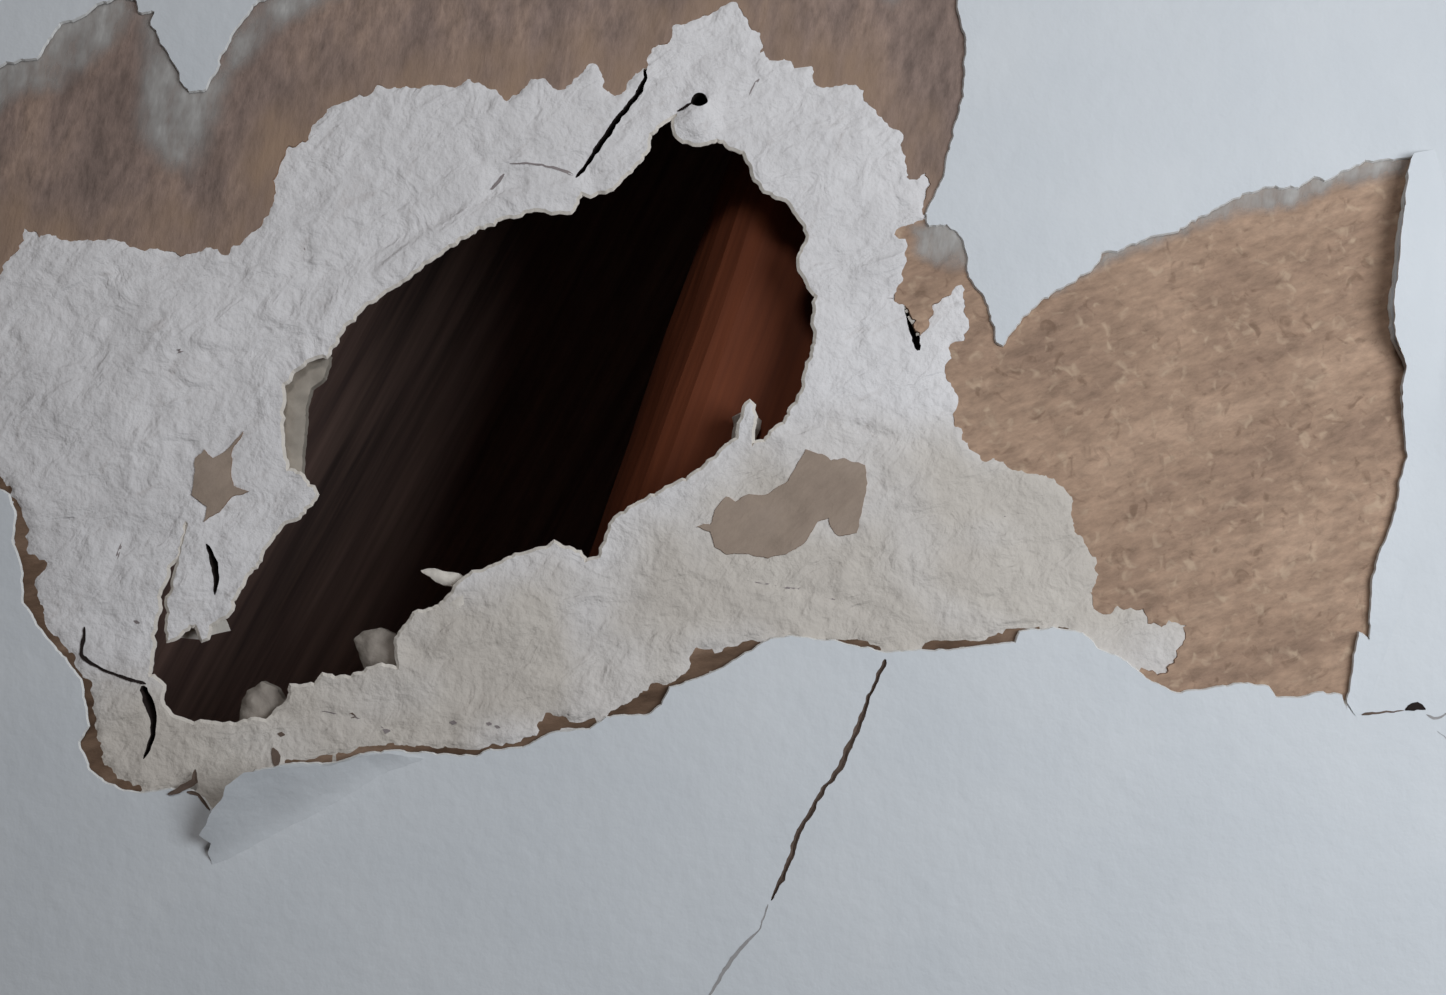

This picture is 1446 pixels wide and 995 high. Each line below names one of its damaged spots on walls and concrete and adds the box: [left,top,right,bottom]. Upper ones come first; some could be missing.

crack [490,70,647,190]
flaking render [0,2,1186,808]
crack [206,544,219,595]
crack [79,627,157,759]
crack [1362,702,1446,738]
crack [168,769,210,810]
crack [709,659,887,995]